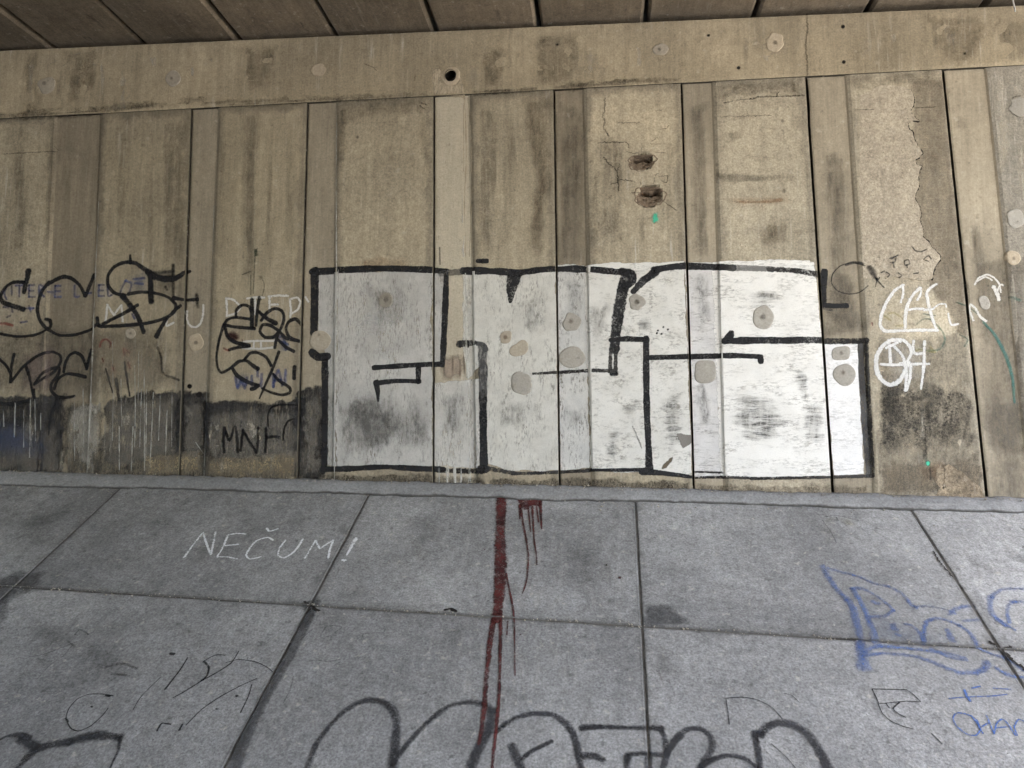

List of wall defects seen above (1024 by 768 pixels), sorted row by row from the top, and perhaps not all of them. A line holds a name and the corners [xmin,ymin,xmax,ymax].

spalling [627,152,668,208]
flaking render [859,85,941,281]
damp [70,395,294,476]
damp [882,384,971,449]